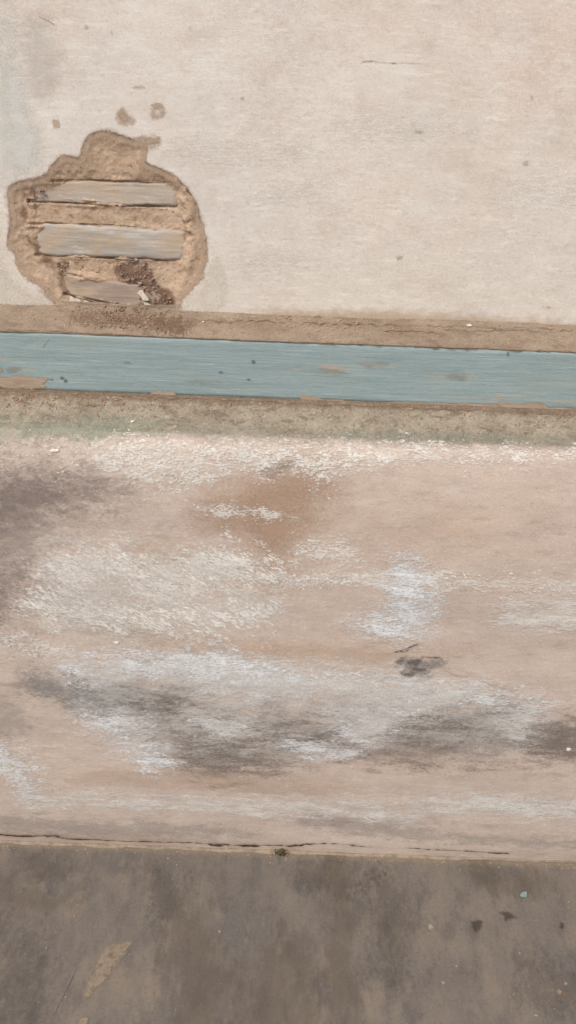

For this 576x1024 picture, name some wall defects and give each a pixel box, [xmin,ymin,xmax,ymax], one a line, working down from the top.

spalling [7,108,208,310]
peeling [0,368,48,390]
leakage [70,673,576,787]
crack [0,834,364,847]
crack [399,847,510,855]